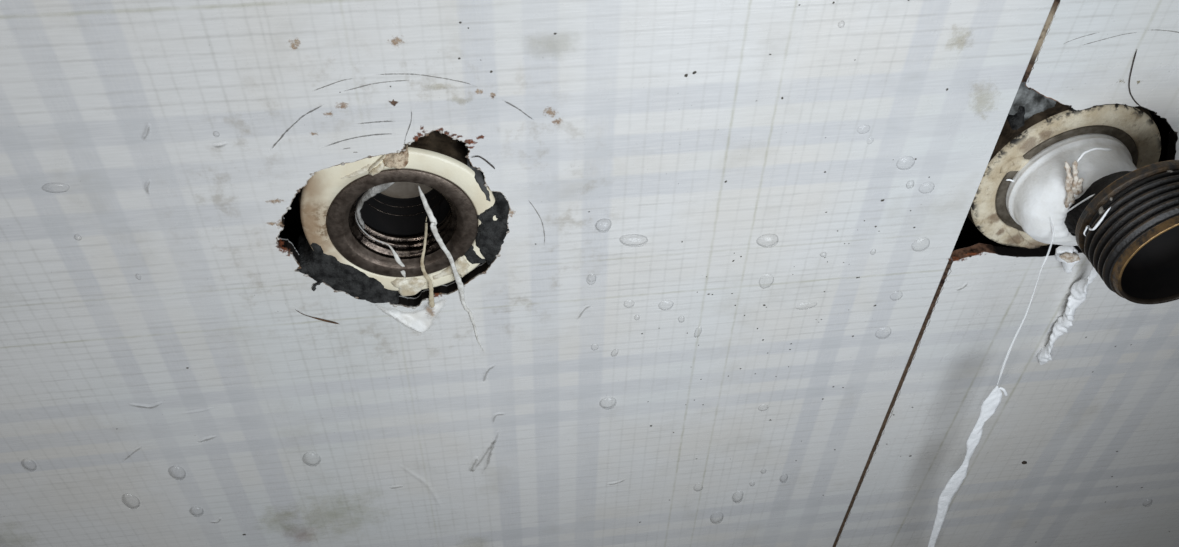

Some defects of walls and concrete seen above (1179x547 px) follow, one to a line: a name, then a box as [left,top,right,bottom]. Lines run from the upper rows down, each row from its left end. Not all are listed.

spalling [276,130,511,309]